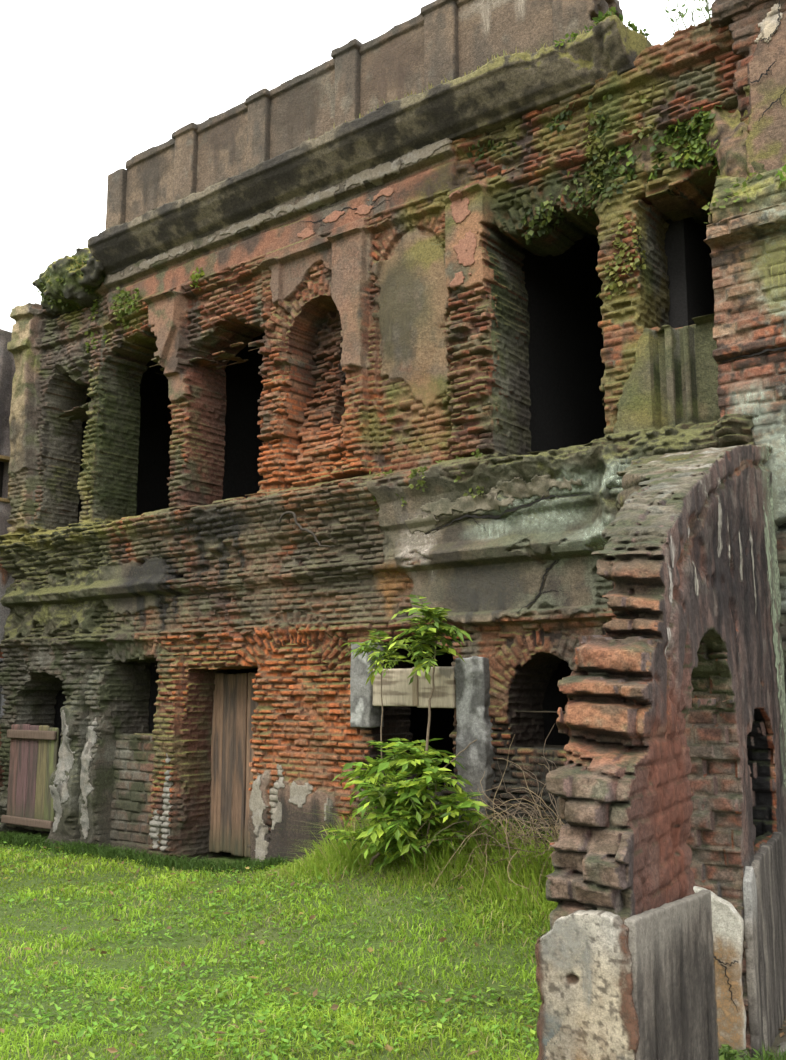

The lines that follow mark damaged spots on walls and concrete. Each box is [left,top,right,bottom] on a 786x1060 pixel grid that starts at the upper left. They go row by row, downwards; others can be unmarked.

peeling [754,3,783,44]
peeling [207,138,452,243]
water stain [407,164,483,201]
peeling [119,244,194,277]
peeling [405,475,582,534]
crack [518,553,564,612]
spalling [160,516,404,864]
crack [714,956,739,1012]